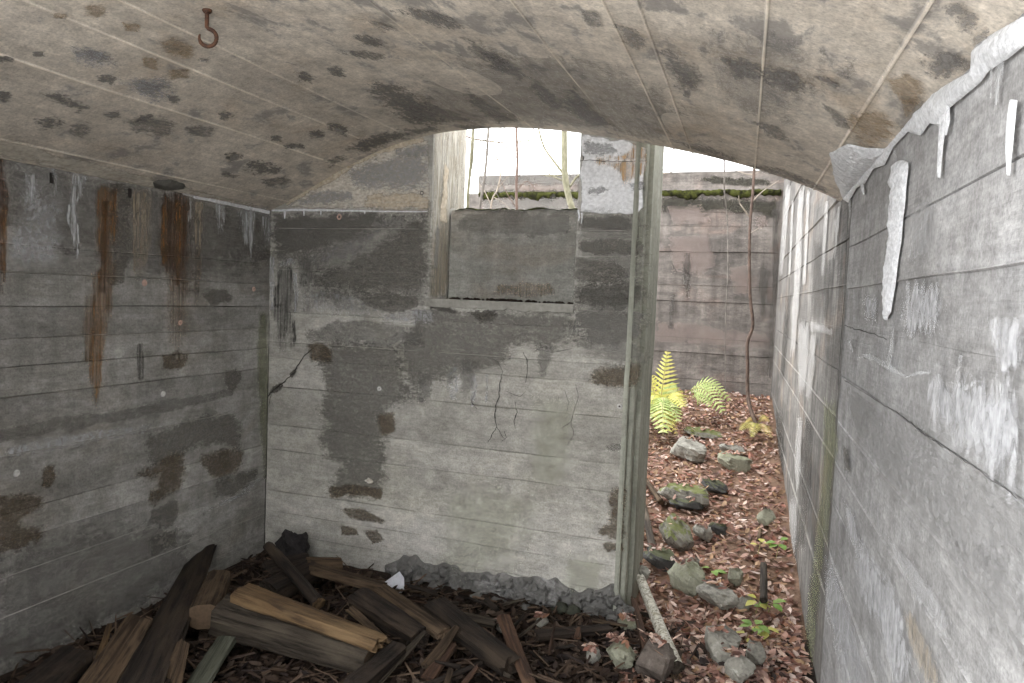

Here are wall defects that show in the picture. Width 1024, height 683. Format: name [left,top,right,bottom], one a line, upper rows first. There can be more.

corrosion [85,186,117,399]
water stain [0,370,258,673]
corrosion [162,351,188,369]
corrosion [161,193,191,318]
crack [264,318,309,544]
water stain [0,162,647,552]
crack [471,348,572,441]
water stain [907,287,937,333]